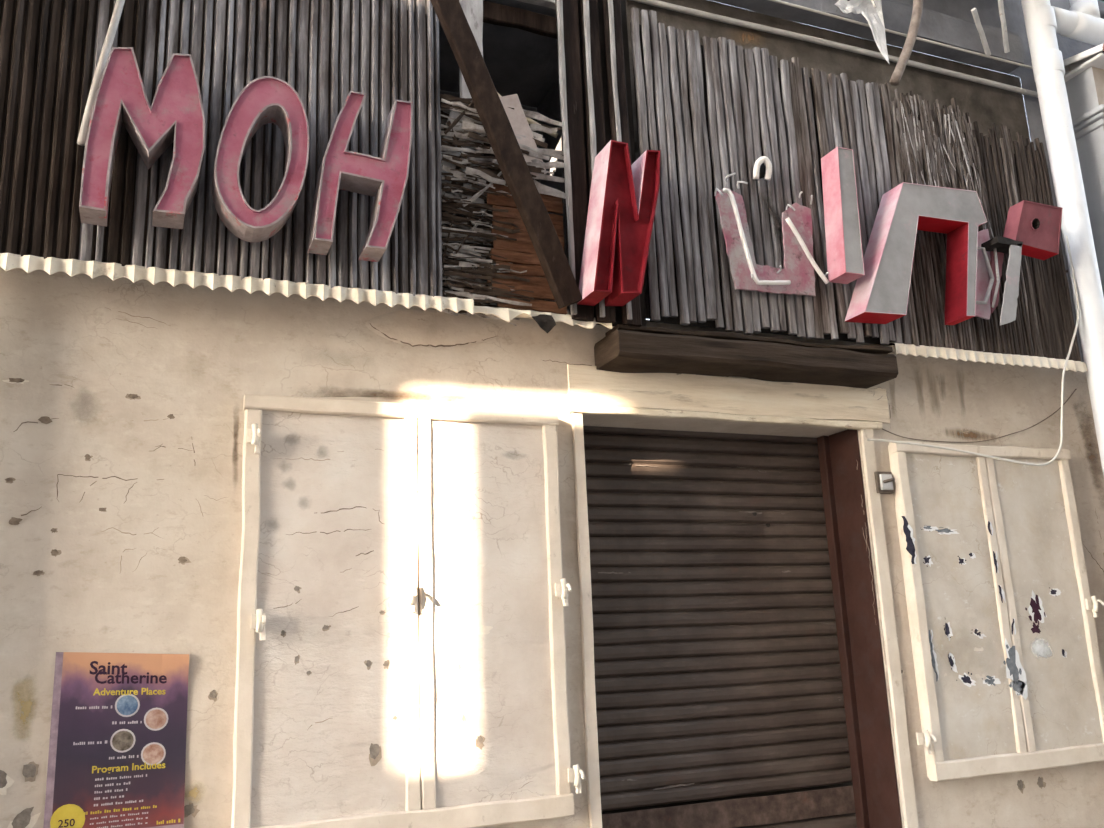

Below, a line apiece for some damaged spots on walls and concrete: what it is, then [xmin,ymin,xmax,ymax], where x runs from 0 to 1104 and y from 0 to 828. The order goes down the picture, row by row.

crack [144,414,196,463]
water stain [952,431,993,439]
crack [9,474,164,525]
crack [102,527,161,572]
peeling [902,516,959,567]
peeling [993,551,1006,603]
peeling [1025,587,1061,634]
peeling [929,618,1028,700]
spalling [0,761,39,795]
spalling [7,807,40,828]